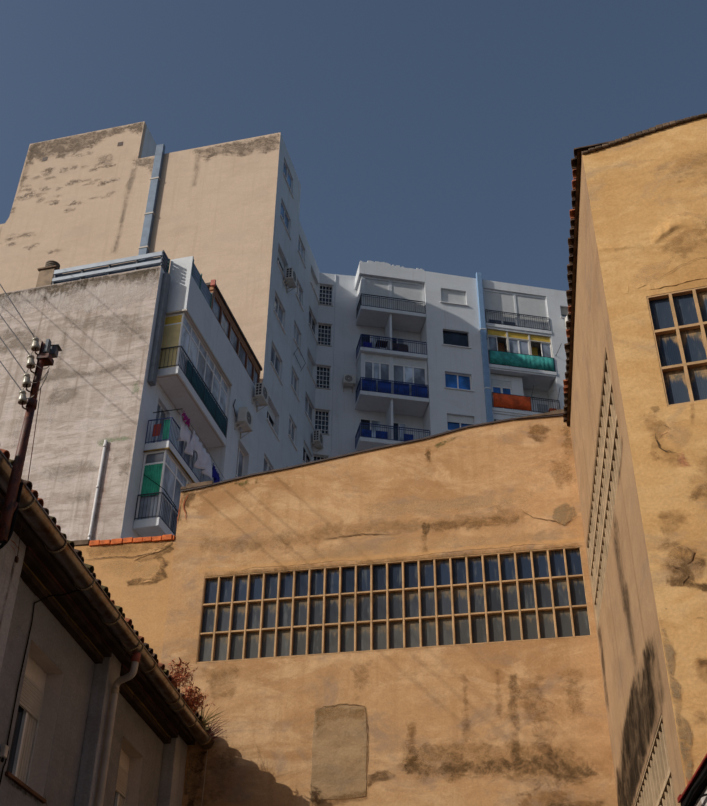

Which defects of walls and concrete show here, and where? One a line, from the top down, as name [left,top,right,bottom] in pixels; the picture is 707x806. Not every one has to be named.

water stain [666,542,707,591]
water stain [614,538,662,806]
water stain [405,743,592,782]